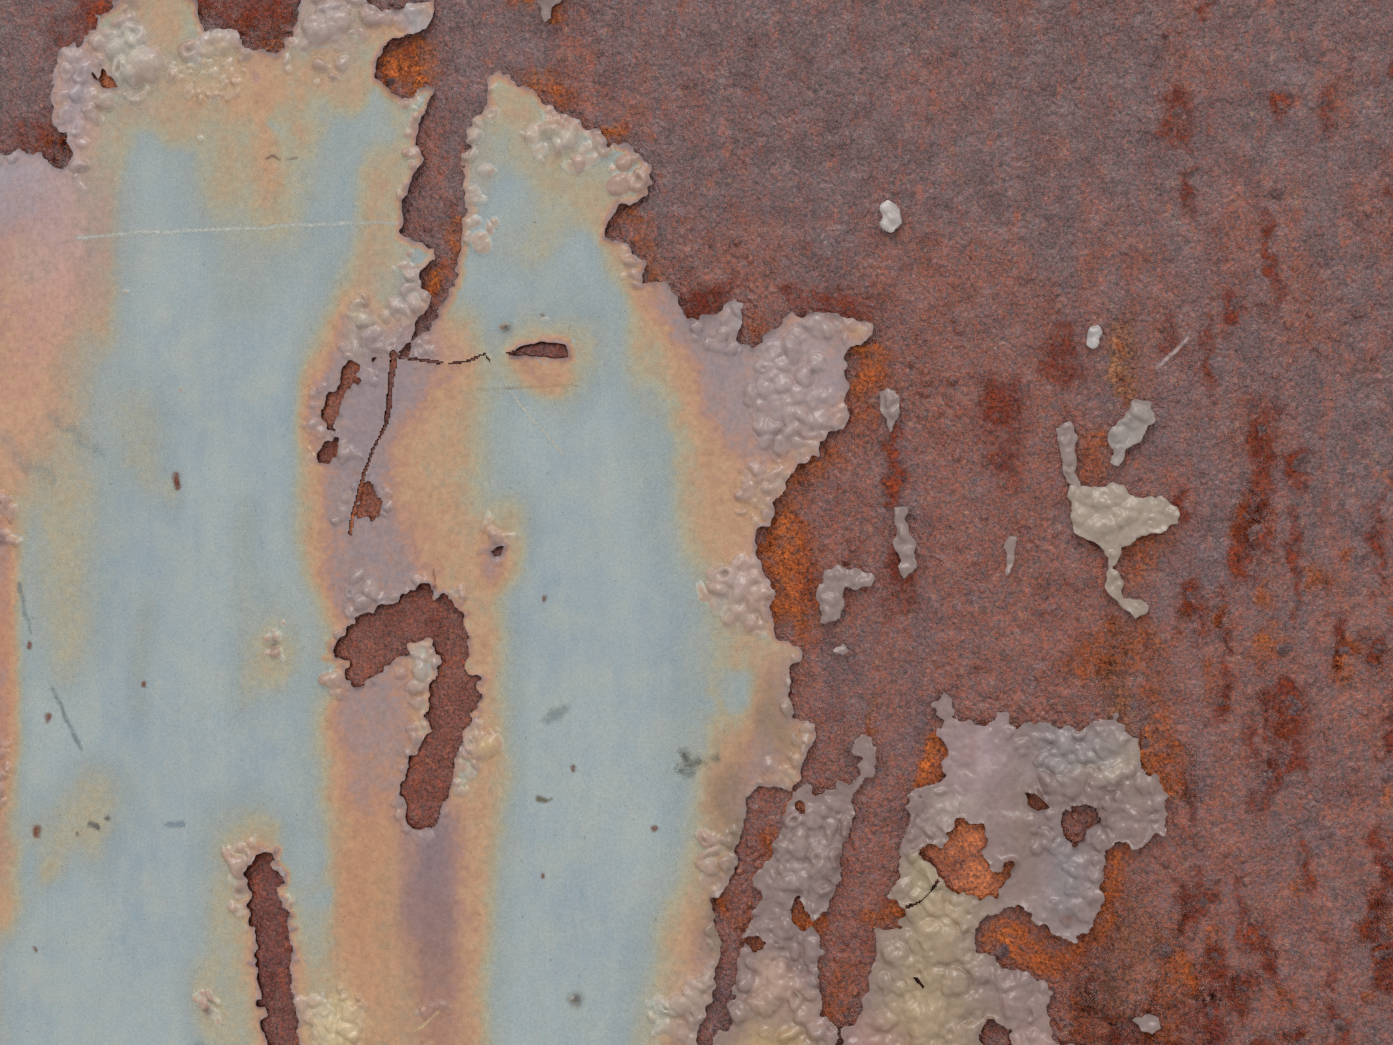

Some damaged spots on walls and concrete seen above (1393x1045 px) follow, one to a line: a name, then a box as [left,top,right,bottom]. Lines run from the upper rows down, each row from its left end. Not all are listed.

crack [365,350,490,469]
corrosion [933,752,946,782]
corrosion [1025,792,1101,847]
corrosion [919,818,1015,900]
corrosion [644,833,722,1000]
corrosion [696,786,791,1045]
corrosion [790,896,803,912]
corrosion [975,905,1076,960]
corrosion [979,1019,1013,1045]